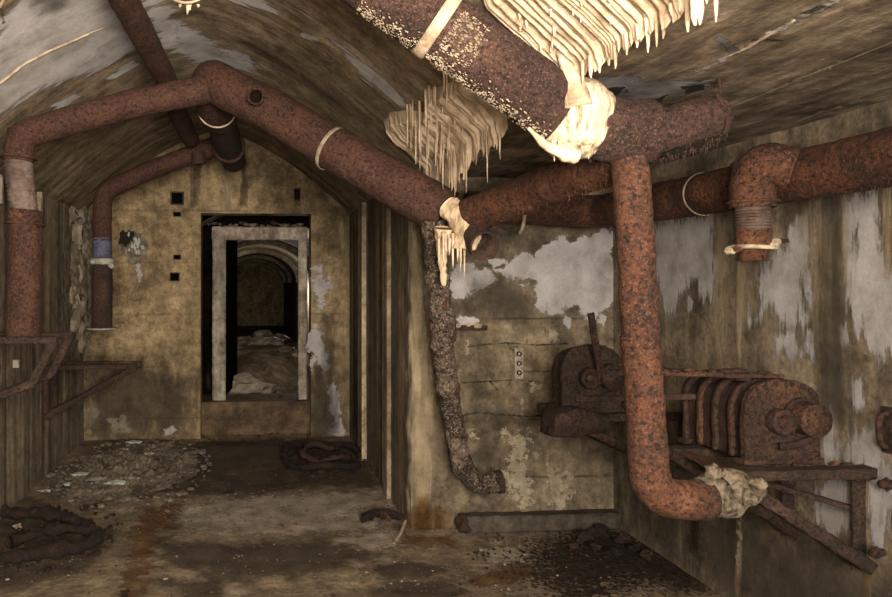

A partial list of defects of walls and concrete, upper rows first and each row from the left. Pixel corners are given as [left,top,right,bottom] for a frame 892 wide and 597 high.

spalling [118,230,148,286]
peeling [310,256,333,311]
peeling [450,228,613,344]
peeling [653,213,720,318]
peeling [747,189,892,364]
peeling [305,323,330,371]
peeling [327,382,347,436]
peeling [822,376,892,558]
peeling [814,480,851,538]